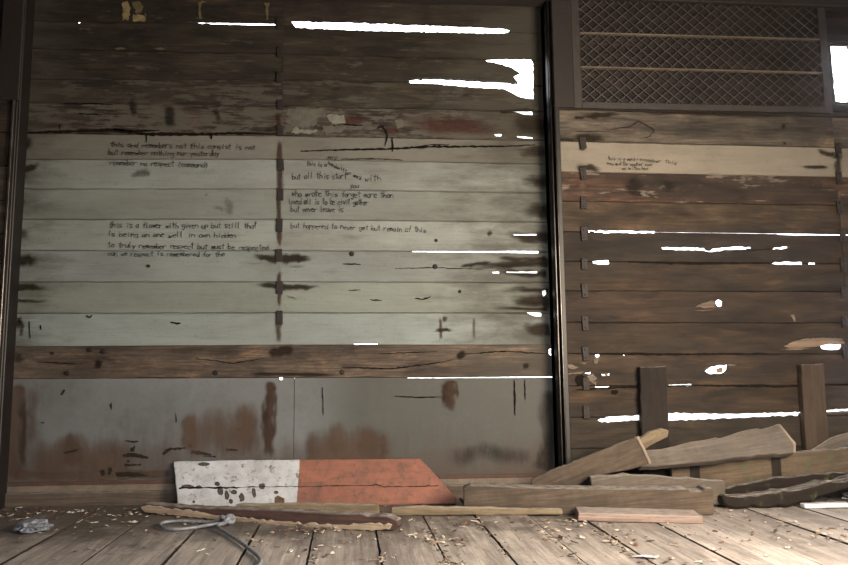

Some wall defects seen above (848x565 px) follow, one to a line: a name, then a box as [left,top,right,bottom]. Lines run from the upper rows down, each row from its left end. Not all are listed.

corrosion [263,382,277,453]
corrosion [442,381,458,408]